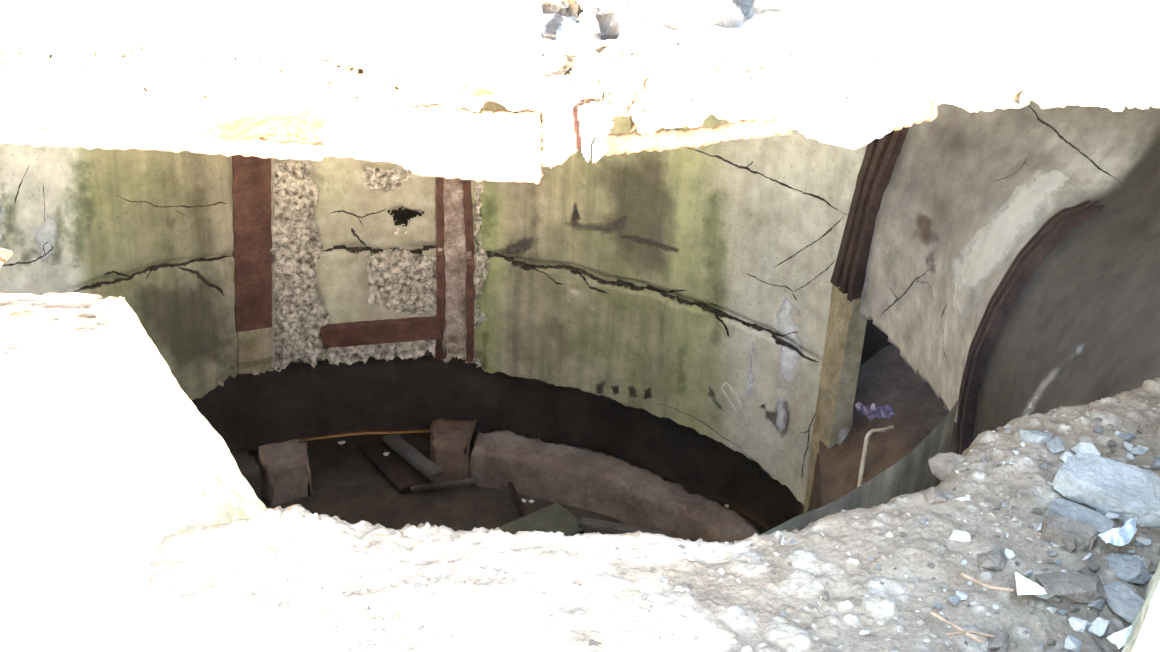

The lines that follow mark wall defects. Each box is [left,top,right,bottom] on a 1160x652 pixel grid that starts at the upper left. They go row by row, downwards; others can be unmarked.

spalling [531,0,673,26]
corrosion [206,108,328,145]
spalling [559,46,774,132]
crack [1027,105,1121,183]
damp [38,215,61,259]
crack [71,256,232,297]
spalling [253,159,437,375]
damp [483,238,533,258]
damp [569,163,678,266]
crack [488,253,821,373]
crack [686,147,847,300]
crack [799,415,815,483]